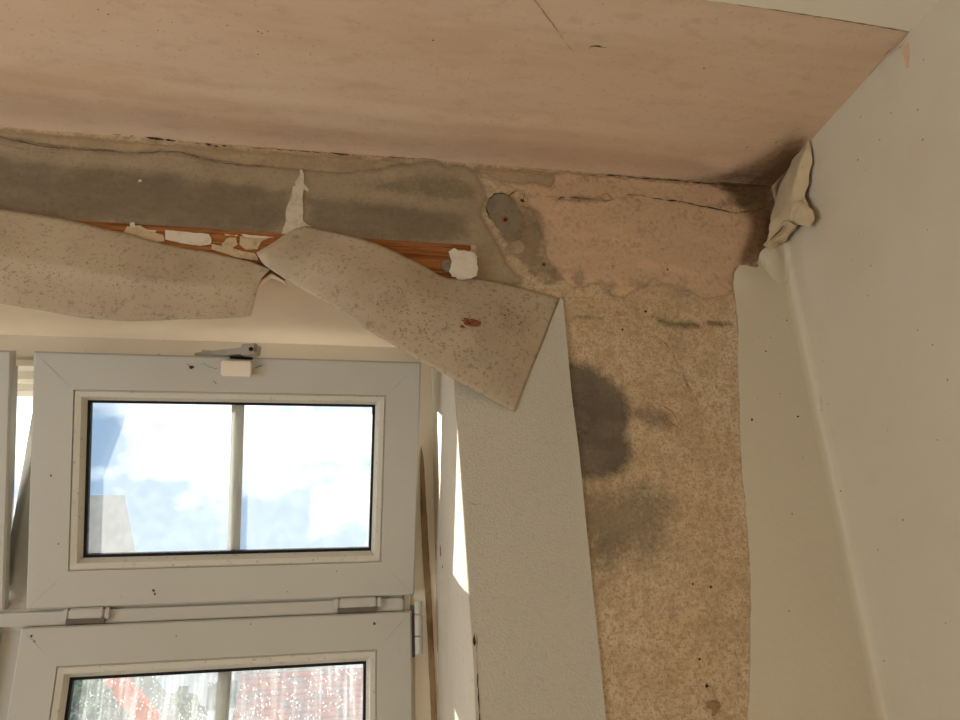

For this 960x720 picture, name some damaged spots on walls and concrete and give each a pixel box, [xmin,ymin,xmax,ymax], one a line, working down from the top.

damp [720,142,798,260]
corrosion [460,318,481,328]
damp [569,364,630,477]